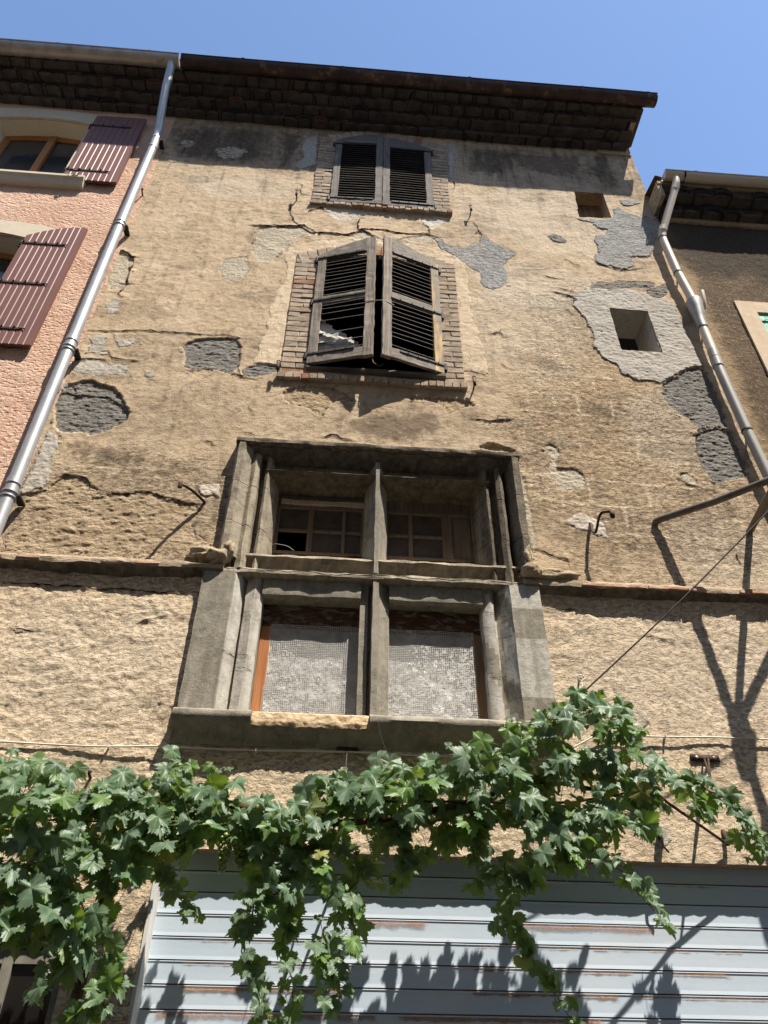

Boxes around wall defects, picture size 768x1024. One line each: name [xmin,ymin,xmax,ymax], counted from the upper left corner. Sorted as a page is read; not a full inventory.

crack [252,185,435,236]
spalling [584,281,669,298]
spalling [180,338,280,377]
spalling [51,381,128,436]
spalling [662,368,746,490]
crack [35,474,200,507]